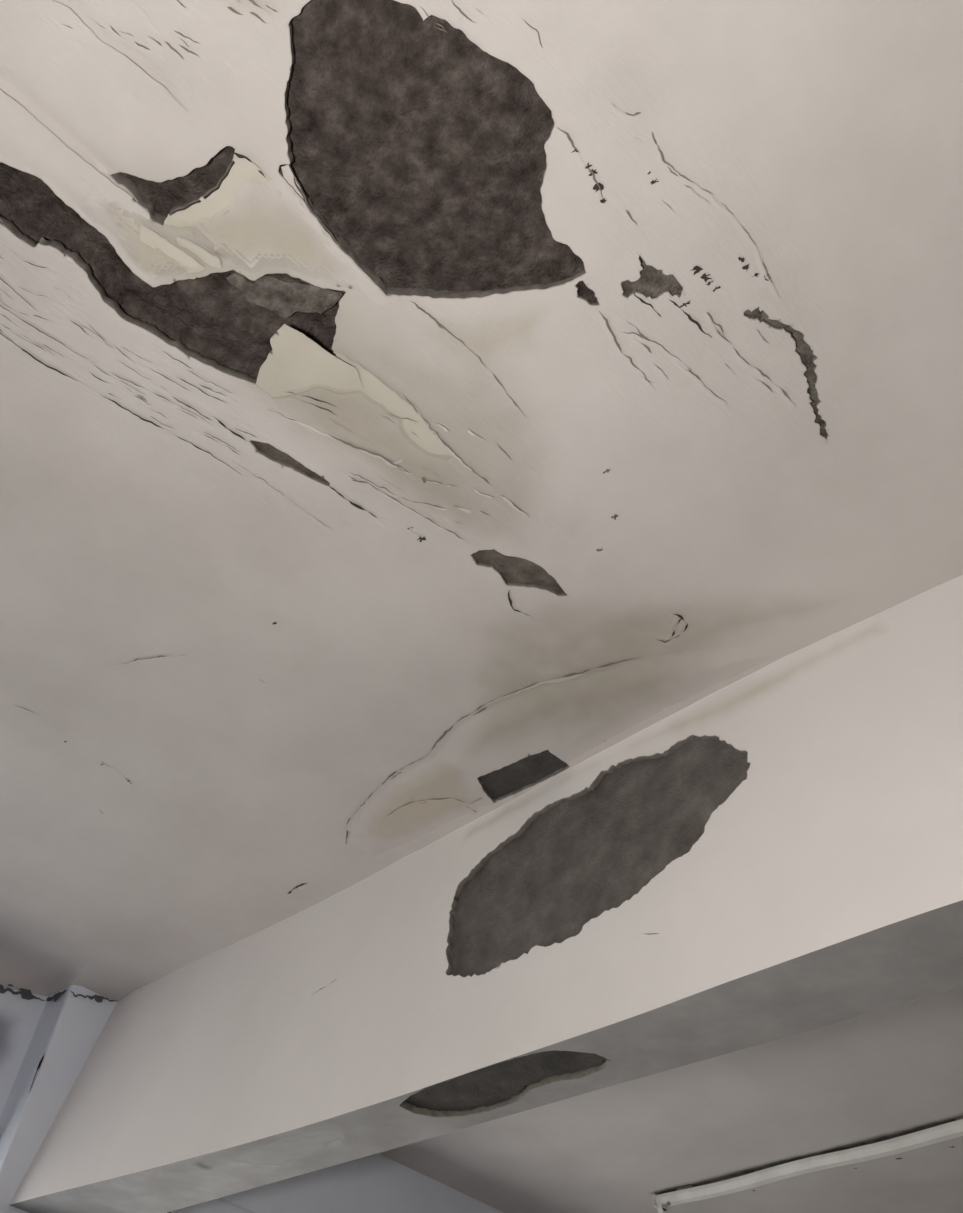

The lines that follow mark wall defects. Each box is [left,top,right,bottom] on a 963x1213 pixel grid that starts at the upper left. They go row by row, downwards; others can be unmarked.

crack [554,127,637,227]
spalling [0,0,599,462]
peeling [620,255,721,308]
crack [595,103,829,440]
spalling [470,549,567,596]
spalling [446,735,751,977]
crack [0,984,116,1003]
spalling [399,1050,611,1117]